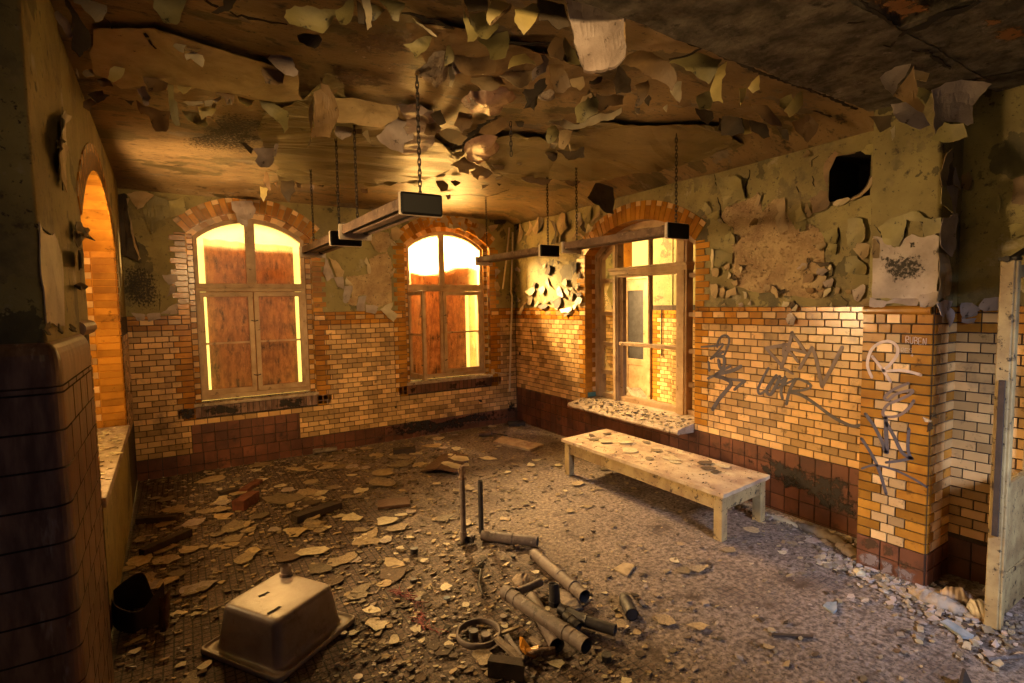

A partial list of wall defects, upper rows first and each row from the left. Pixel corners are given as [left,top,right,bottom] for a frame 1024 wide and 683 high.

mould [183,108,265,152]
peeling [54,0,819,245]
peeling [702,64,1024,327]
peeling [38,222,95,335]
spalling [323,226,404,322]
peeling [495,260,582,317]
mould [881,242,925,283]
leakage [749,453,858,516]